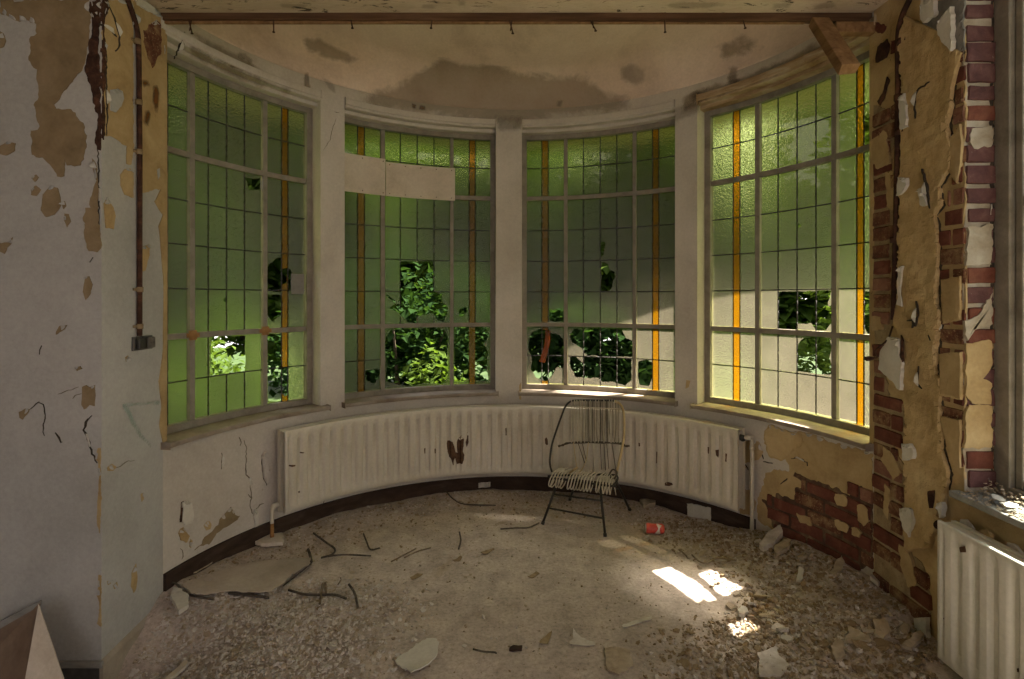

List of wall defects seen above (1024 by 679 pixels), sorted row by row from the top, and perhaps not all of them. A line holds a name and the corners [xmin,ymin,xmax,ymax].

crack [30,387,134,468]
peeling [0,0,168,442]
peeling [178,501,240,550]
corrosion [447,435,464,465]
flaking render [739,93,947,639]
flaking render [920,0,996,492]